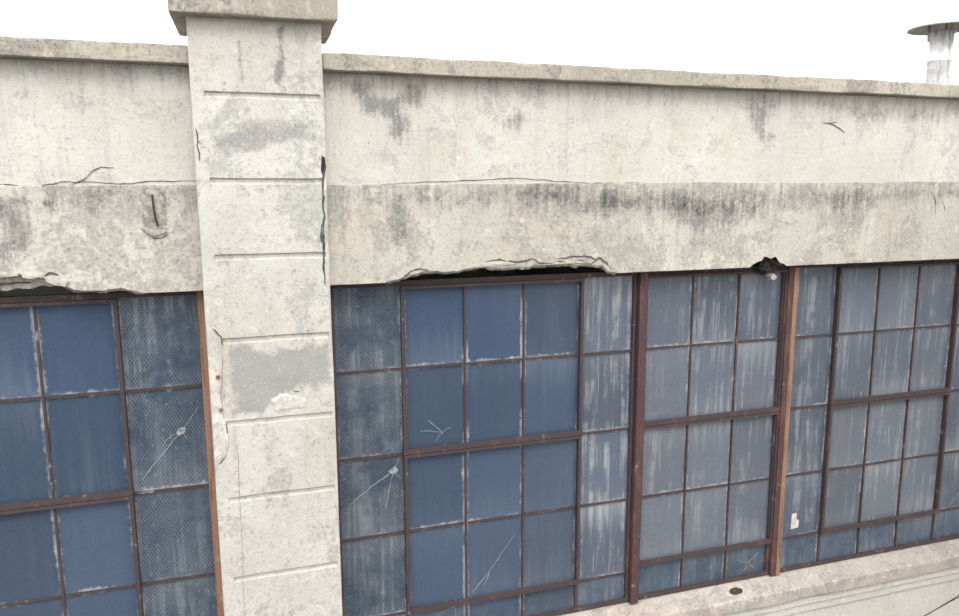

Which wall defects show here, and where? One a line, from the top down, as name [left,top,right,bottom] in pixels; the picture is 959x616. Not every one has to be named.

crack [0,167,182,186]
damp [518,183,652,216]
damp [664,192,764,229]
damp [0,201,31,258]
spalling [0,271,145,294]
spalling [387,255,616,284]
spalling [755,257,785,280]